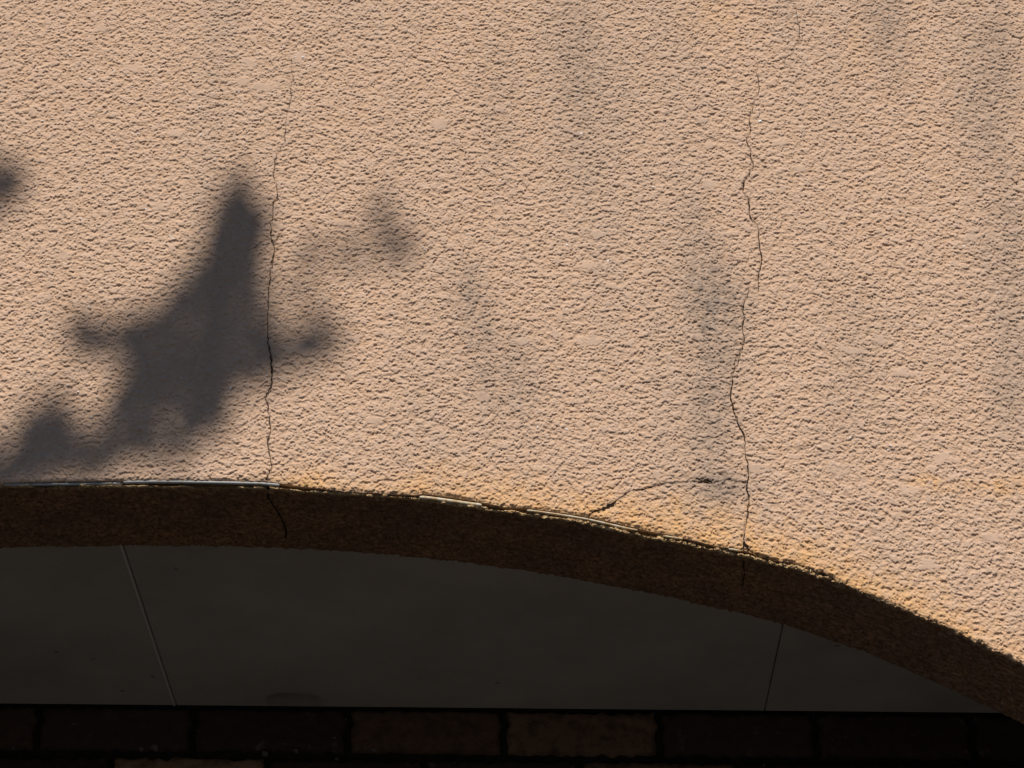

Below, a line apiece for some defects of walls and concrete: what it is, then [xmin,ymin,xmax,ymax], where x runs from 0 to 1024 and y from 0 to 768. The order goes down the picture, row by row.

crack [249,59,294,538]
crack [588,68,776,587]